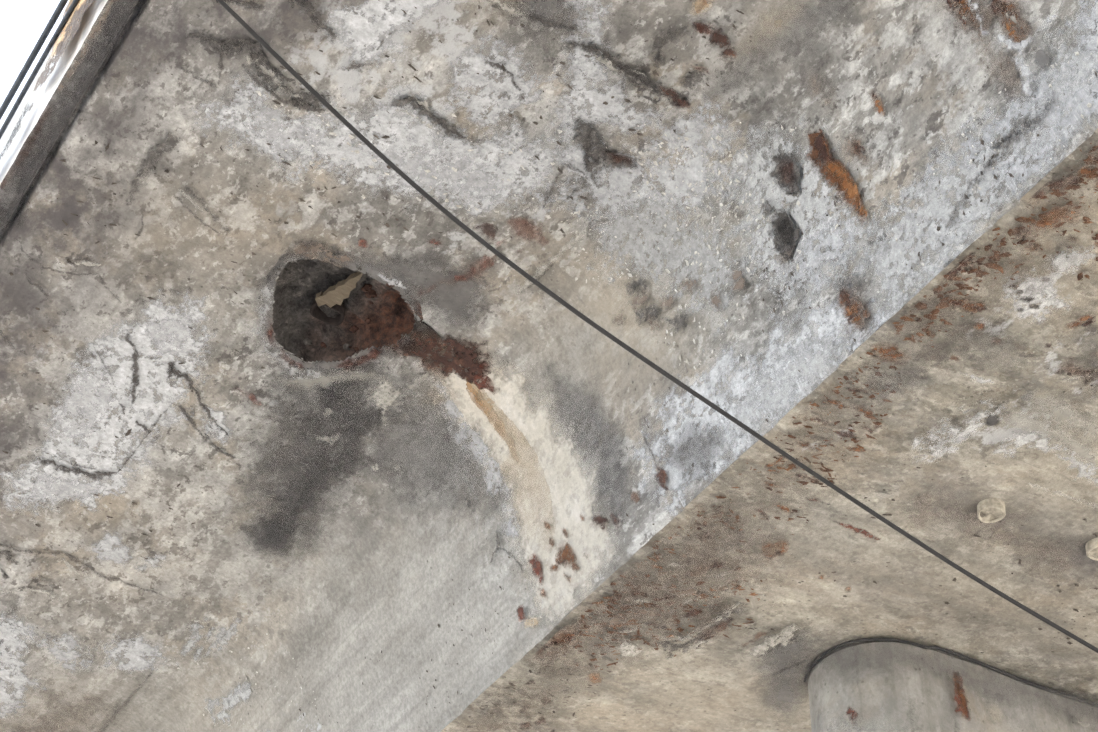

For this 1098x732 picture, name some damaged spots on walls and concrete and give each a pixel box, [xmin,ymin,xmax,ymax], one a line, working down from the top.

rust [693,0,736,57]
rust [937,0,1036,86]
spalling [567,117,637,199]
spalling [770,153,800,195]
spalling [267,251,423,364]
water stain [194,0,1098,516]
spalling [762,200,799,265]
crack [38,333,228,481]
water stain [250,362,387,551]
water stain [401,329,625,621]
rust [455,130,1098,732]
crack [0,544,162,601]